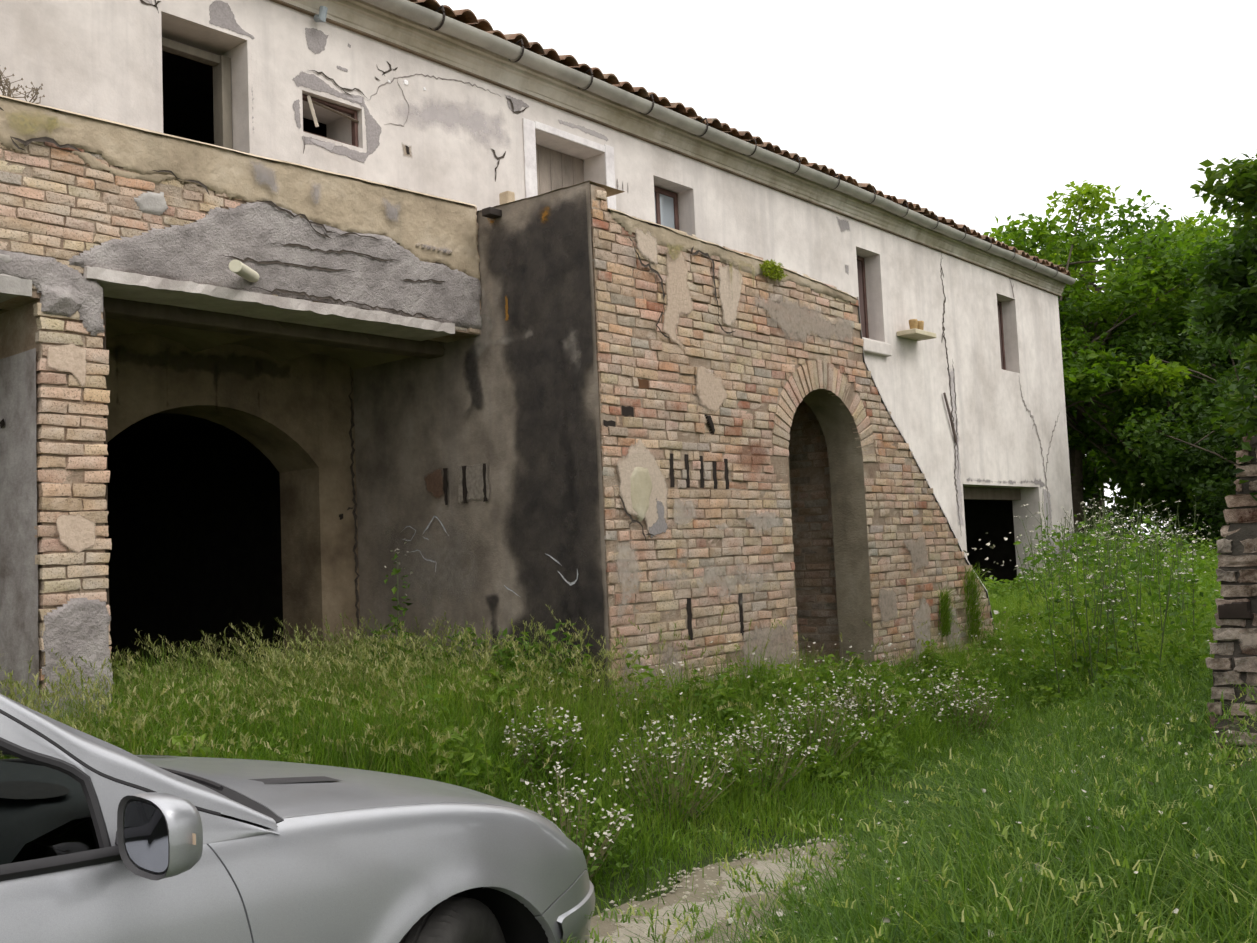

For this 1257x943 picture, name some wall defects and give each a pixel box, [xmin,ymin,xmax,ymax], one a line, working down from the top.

crack [310,70,500,126]
damp [465,338,483,408]
damp [486,197,607,706]
crack [940,252,961,529]
crack [1020,385,1060,527]